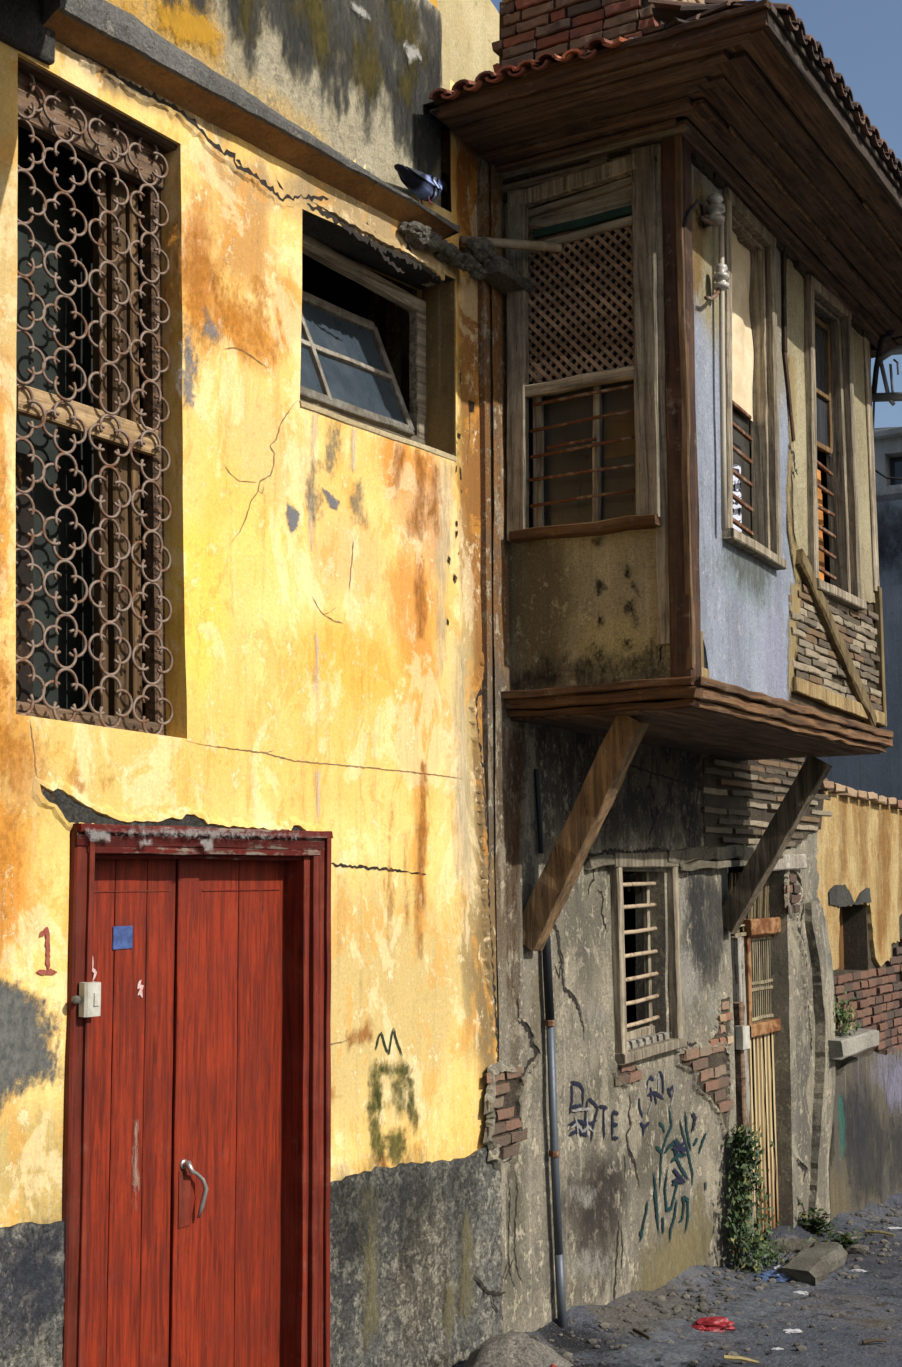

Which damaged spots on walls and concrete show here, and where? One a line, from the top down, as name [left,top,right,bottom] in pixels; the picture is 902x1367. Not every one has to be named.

damp [164,0,443,176]
crack [55,40,445,285]
crack [225,402,296,543]
rust [395,447,438,535]
damp [877,507,902,568]
rust [416,577,425,635]
mould [511,567,658,691]
flaking render [32,776,324,851]
crack [186,644,542,1084]
crack [553,918,587,1041]
flaking render [483,1060,528,1170]
flaking render [674,992,734,1141]